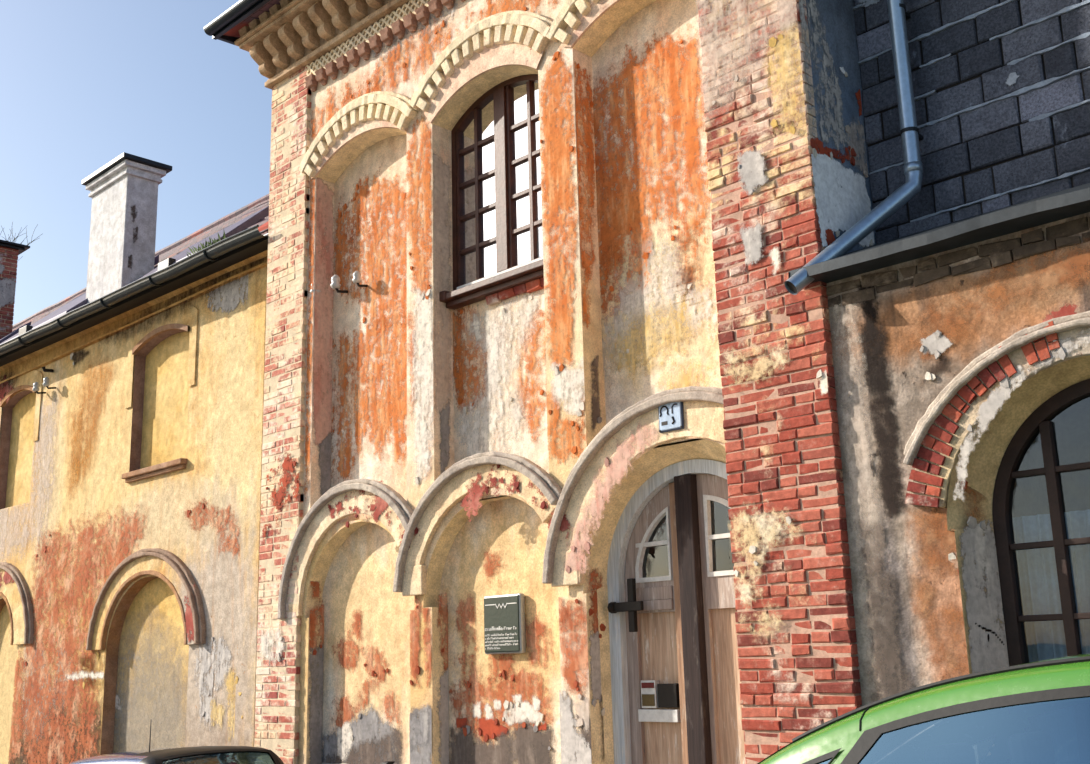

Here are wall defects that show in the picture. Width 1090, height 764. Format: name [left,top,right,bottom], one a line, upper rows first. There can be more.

flaking render [0,265,16,308]
peeling [0,399,146,764]
peeling [185,498,241,556]
peeling [262,29,718,764]
flaking render [740,222,762,264]
flaking render [737,149,767,195]
flaking render [767,24,871,247]
leakage [833,281,913,699]
flaking render [919,330,952,381]
flaking render [953,328,1090,500]
flaking render [1043,304,1078,322]
flaking render [184,584,243,736]